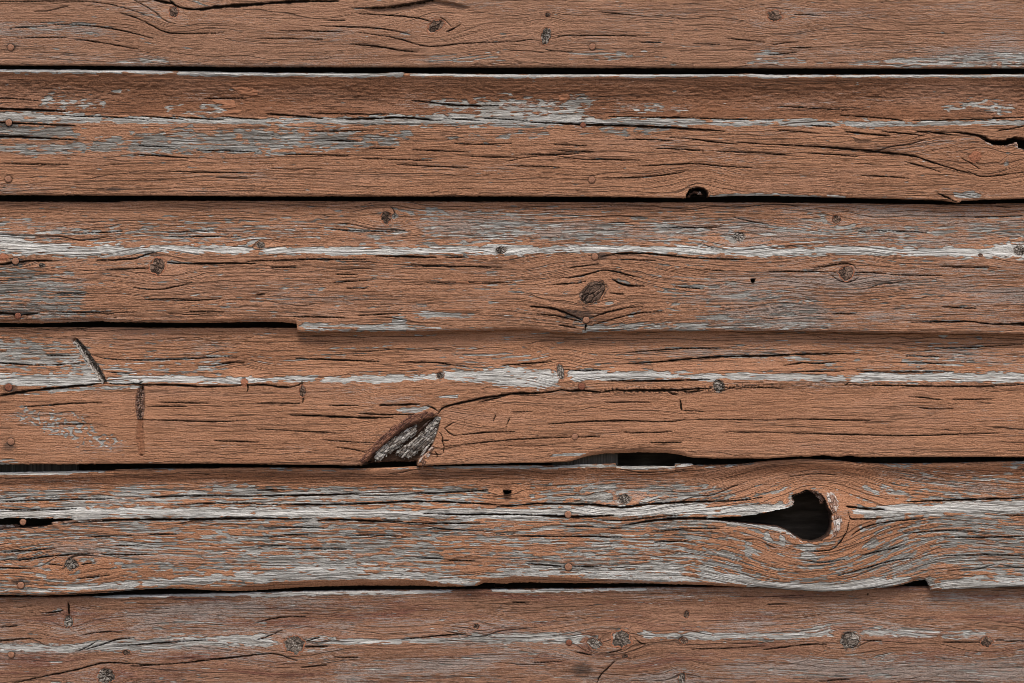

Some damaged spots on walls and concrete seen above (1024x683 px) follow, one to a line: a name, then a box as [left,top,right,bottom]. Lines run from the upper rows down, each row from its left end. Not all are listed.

crack [0,98,1022,217]
peeling [0,48,1024,158]
peeling [0,206,1024,323]
crack [0,306,1024,454]
peeling [0,336,1024,453]
peeling [0,452,1024,653]
peeling [768,626,1024,683]